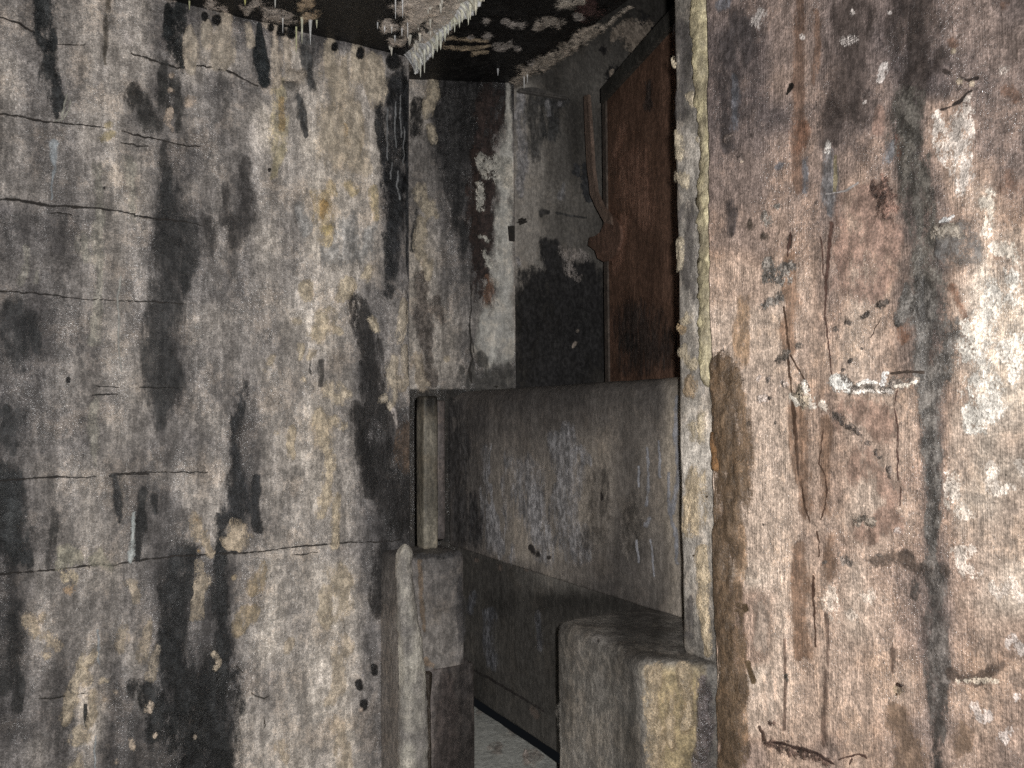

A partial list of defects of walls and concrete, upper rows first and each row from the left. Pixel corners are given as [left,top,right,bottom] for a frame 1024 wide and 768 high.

water stain [817,0,876,217]
crack [0,113,200,147]
crack [0,198,202,226]
crack [0,290,187,304]
water stain [141,143,256,431]
water stain [292,0,769,768]
water stain [870,0,1024,768]
crack [783,222,834,647]
crack [0,471,208,481]
crack [0,539,402,576]
crack [838,754,867,764]